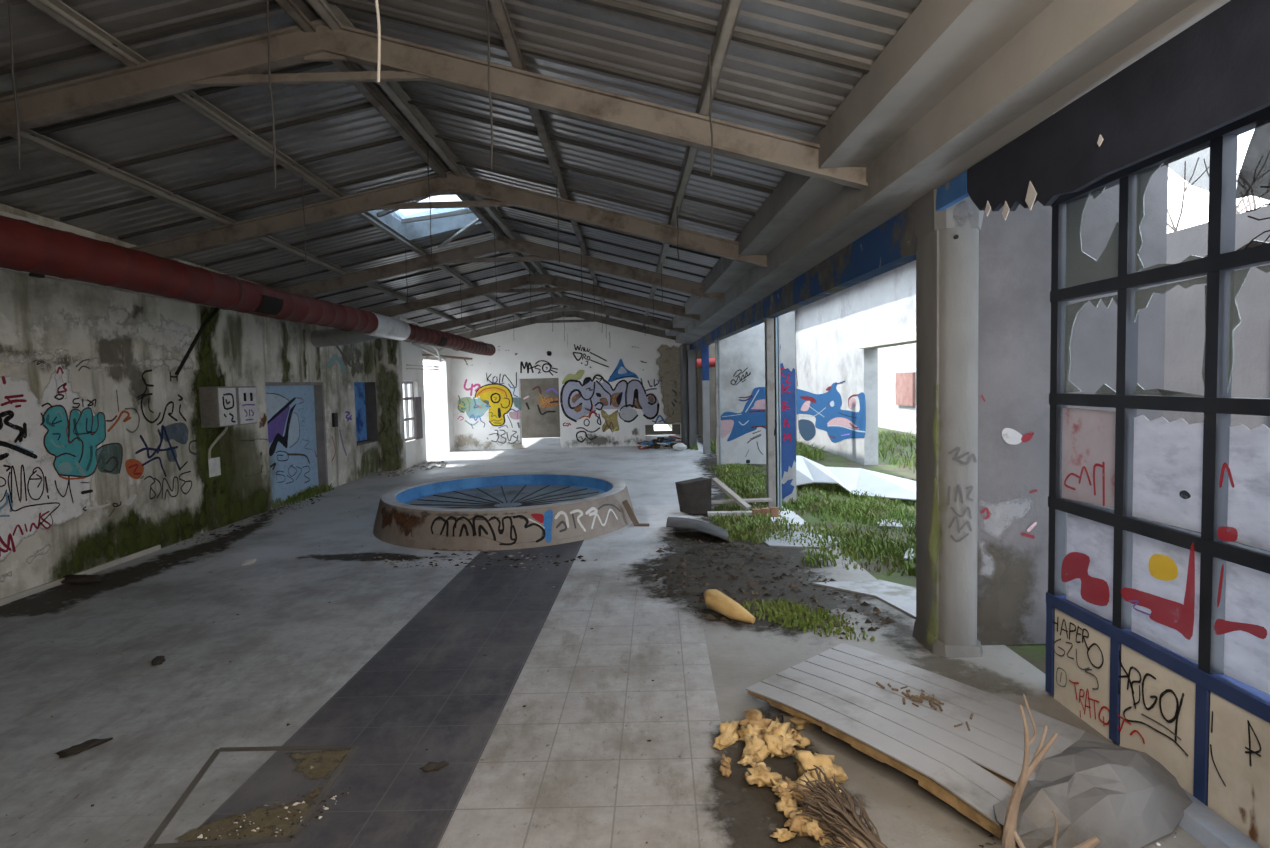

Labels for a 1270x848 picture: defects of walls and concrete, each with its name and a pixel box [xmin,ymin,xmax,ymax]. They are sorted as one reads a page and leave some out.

leakage [193,315,225,392]
leakage [203,440,229,514]